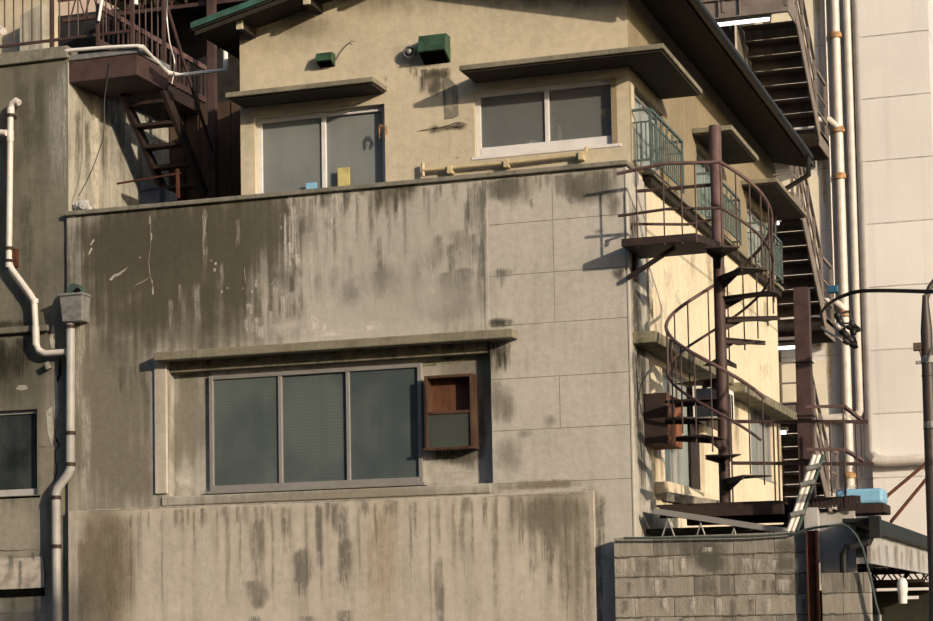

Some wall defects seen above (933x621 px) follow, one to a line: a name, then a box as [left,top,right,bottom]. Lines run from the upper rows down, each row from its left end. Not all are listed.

leakage [410,68,458,112]
leakage [283,196,312,281]
leakage [370,185,430,290]
leakage [468,177,519,276]
leakage [490,342,510,367]
leakage [519,480,571,488]
leakage [295,502,351,585]
peeling [0,556,45,598]
leakage [436,579,445,621]